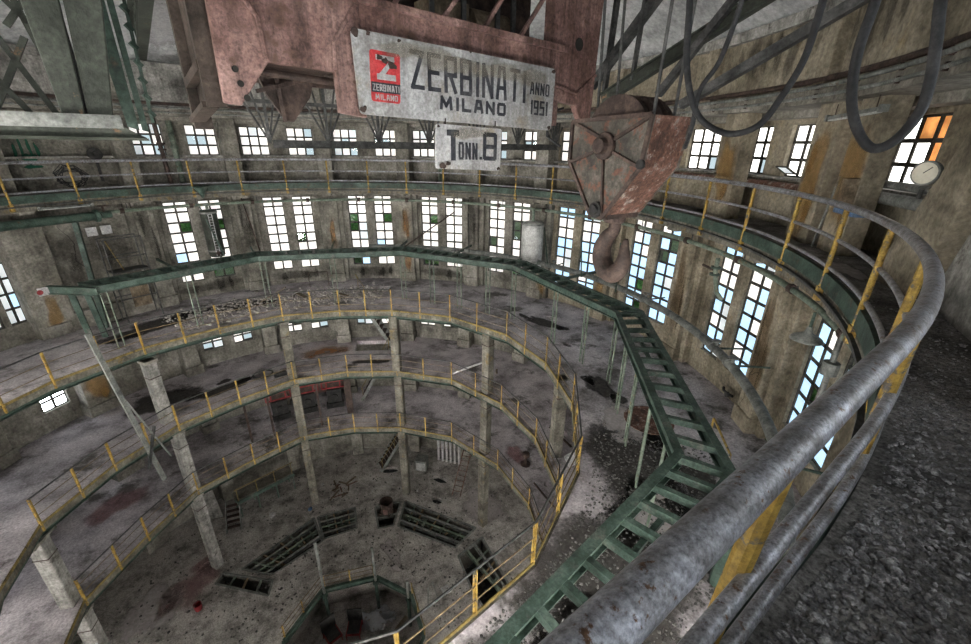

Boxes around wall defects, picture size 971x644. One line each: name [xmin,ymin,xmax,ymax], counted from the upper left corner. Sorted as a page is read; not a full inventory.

leakage [519,313,570,330]
leakage [514,375,668,604]
leakage [616,454,717,554]
leakage [521,622,548,644]
leakage [549,595,578,624]
leakage [642,599,686,644]